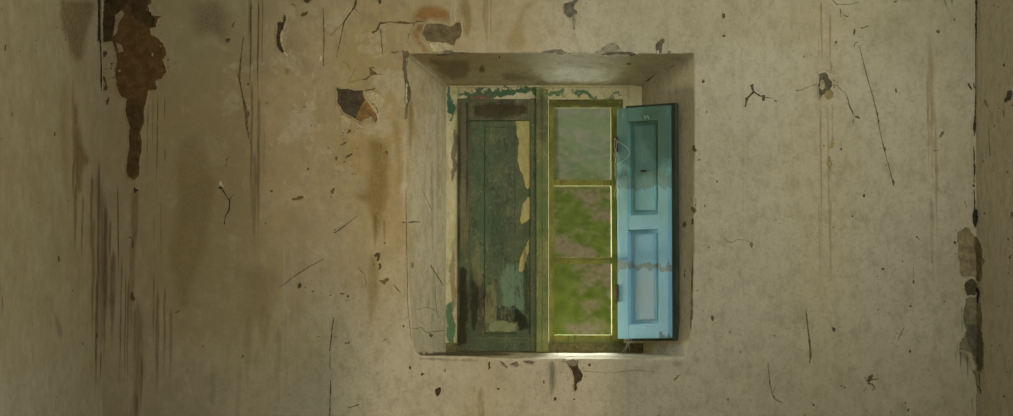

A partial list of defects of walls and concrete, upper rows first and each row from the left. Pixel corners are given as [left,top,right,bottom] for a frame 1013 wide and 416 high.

flaking render [421,21,473,57]
flaking render [101,0,169,193]
flaking render [328,86,384,172]
crack [745,42,895,186]
flaking render [816,70,839,101]
flaking render [954,225,988,283]
flaking render [957,296,1000,375]
flaking render [560,358,602,400]